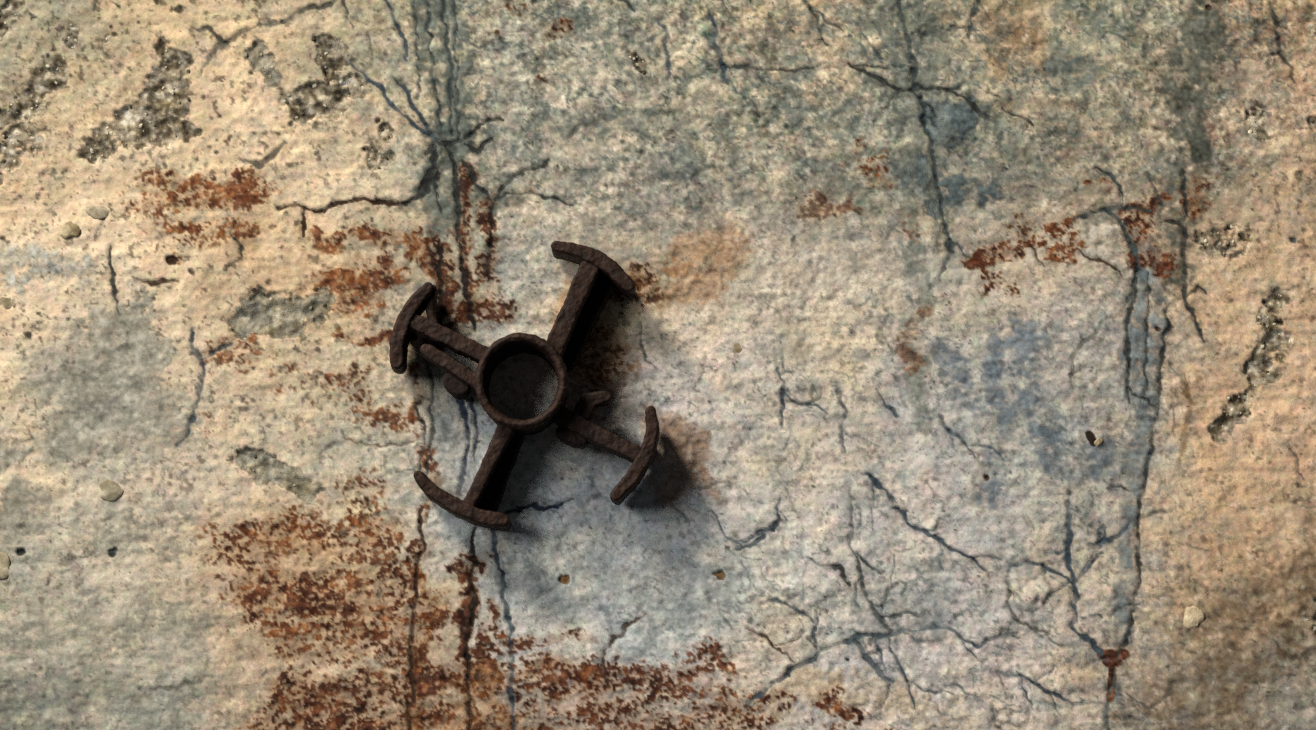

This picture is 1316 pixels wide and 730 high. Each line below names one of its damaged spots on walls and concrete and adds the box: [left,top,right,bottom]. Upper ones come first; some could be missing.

spalling [0,0,25,41]
spalling [0,24,79,184]
spalling [78,31,202,164]
corrosion [121,165,276,264]
spalling [242,34,365,126]
crack [190,0,604,331]
corrosion [299,161,520,346]
crack [699,0,1034,278]
corrosion [961,213,1085,296]
crack [746,167,1207,730]
crack [327,359,478,730]
corrosion [198,467,796,730]